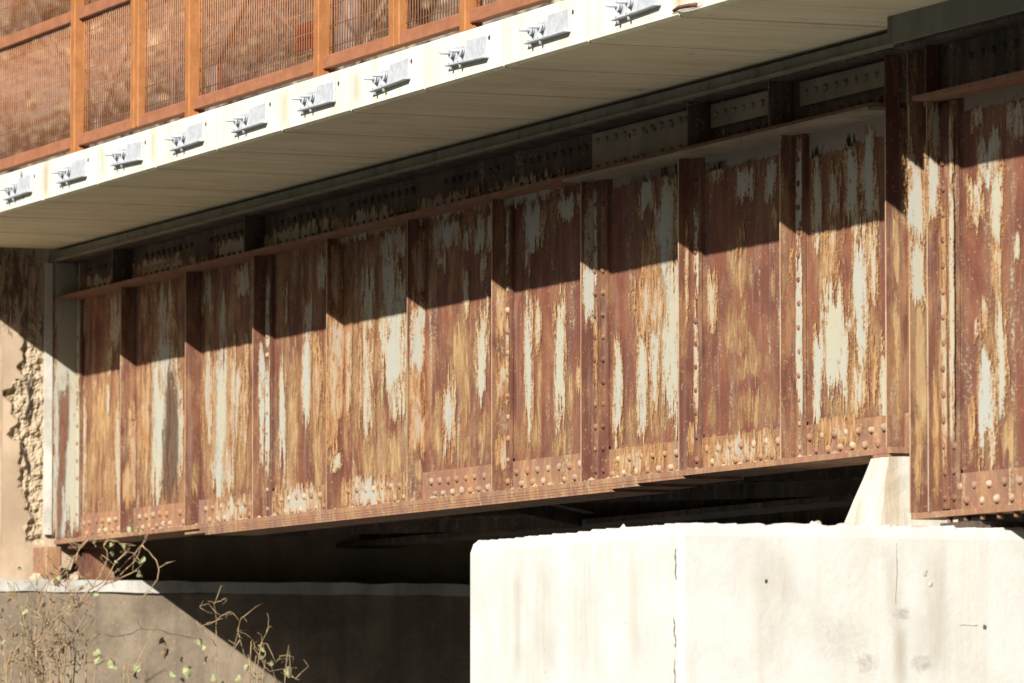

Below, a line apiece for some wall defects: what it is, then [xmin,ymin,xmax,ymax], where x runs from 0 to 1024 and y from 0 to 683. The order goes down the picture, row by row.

corrosion [57,375,69,545]
corrosion [86,364,111,513]
spalling [2,235,326,545]
corrosion [288,337,323,485]
peeling [264,167,598,508]
corrosion [448,313,491,468]
corrosion [518,363,573,456]
corrosion [726,245,771,431]
corrosion [892,207,901,419]
corrosion [914,302,941,503]
peeling [903,84,1024,472]
corrosion [970,403,1016,466]